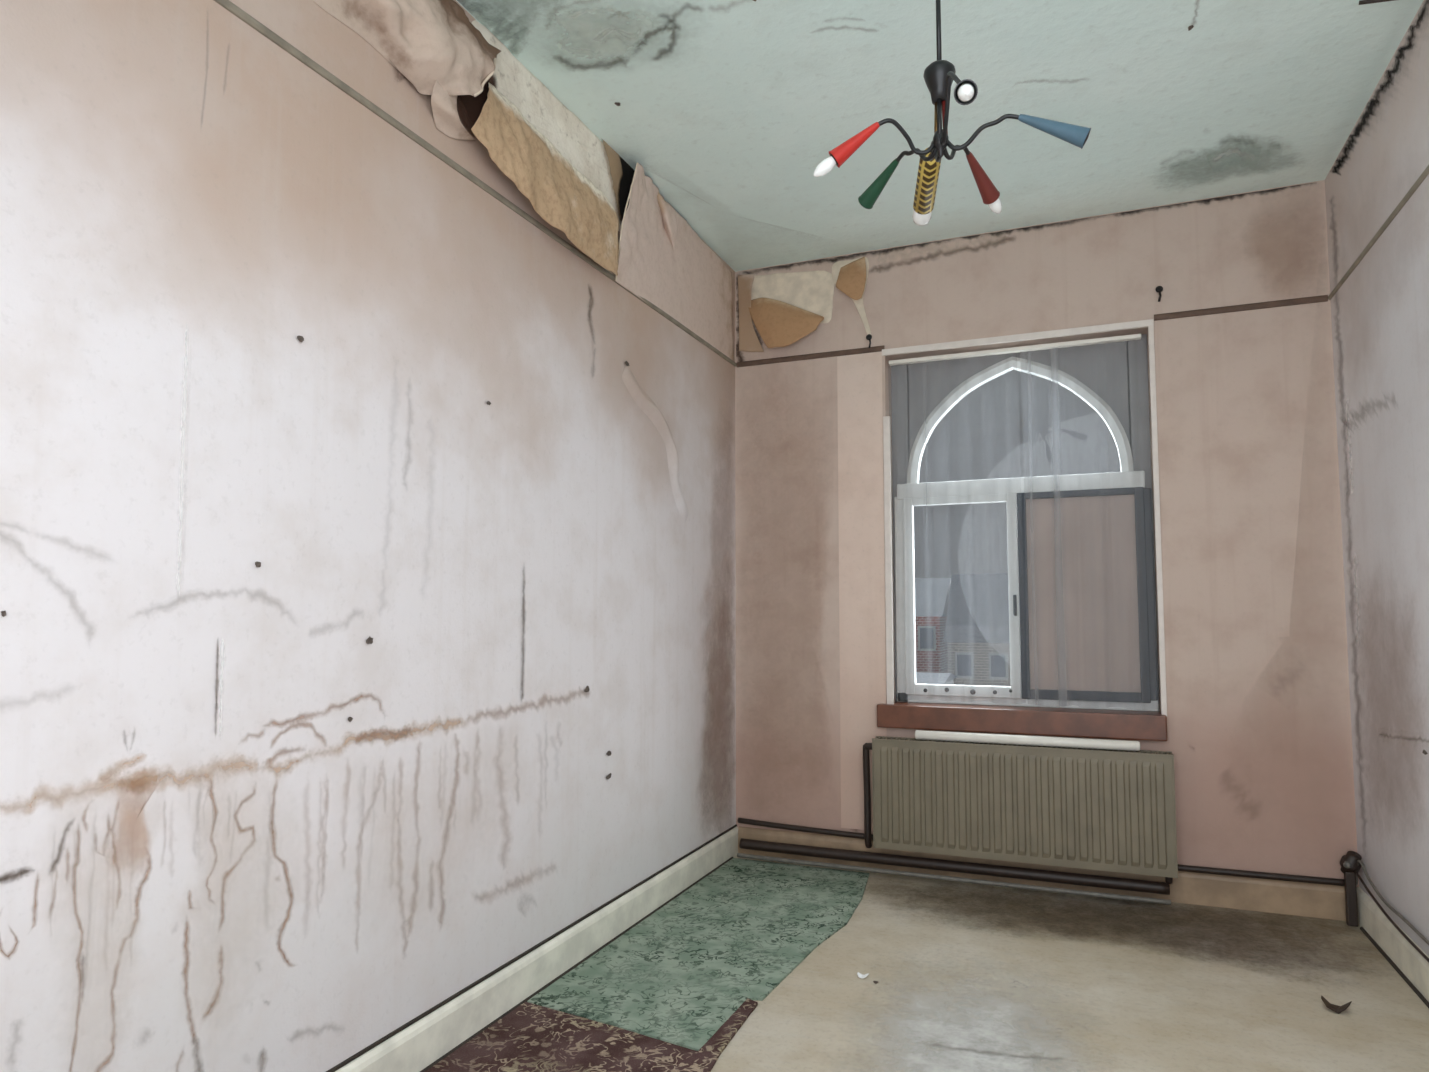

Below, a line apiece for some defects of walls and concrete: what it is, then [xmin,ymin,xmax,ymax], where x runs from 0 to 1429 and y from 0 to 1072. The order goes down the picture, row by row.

spalling [457,20,635,231]
spalling [751,257,871,335]
leakage [345,721,460,744]
leakage [0,869,37,922]
leakage [52,827,82,984]
leakage [271,804,292,964]